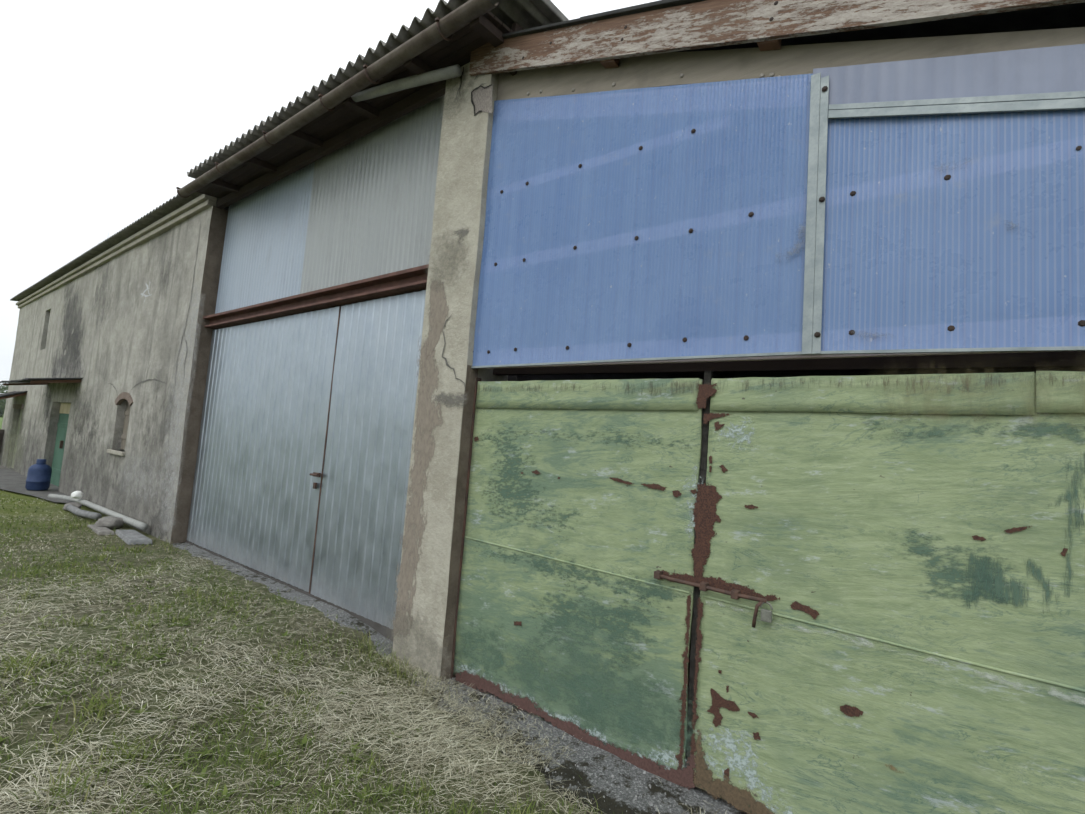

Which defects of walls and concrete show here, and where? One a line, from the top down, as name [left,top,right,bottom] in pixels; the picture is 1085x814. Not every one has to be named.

crack [442,313,465,386]
rust [696,383,729,431]
rust [610,456,820,620]
rust [454,595,775,814]
rust [840,704,863,717]